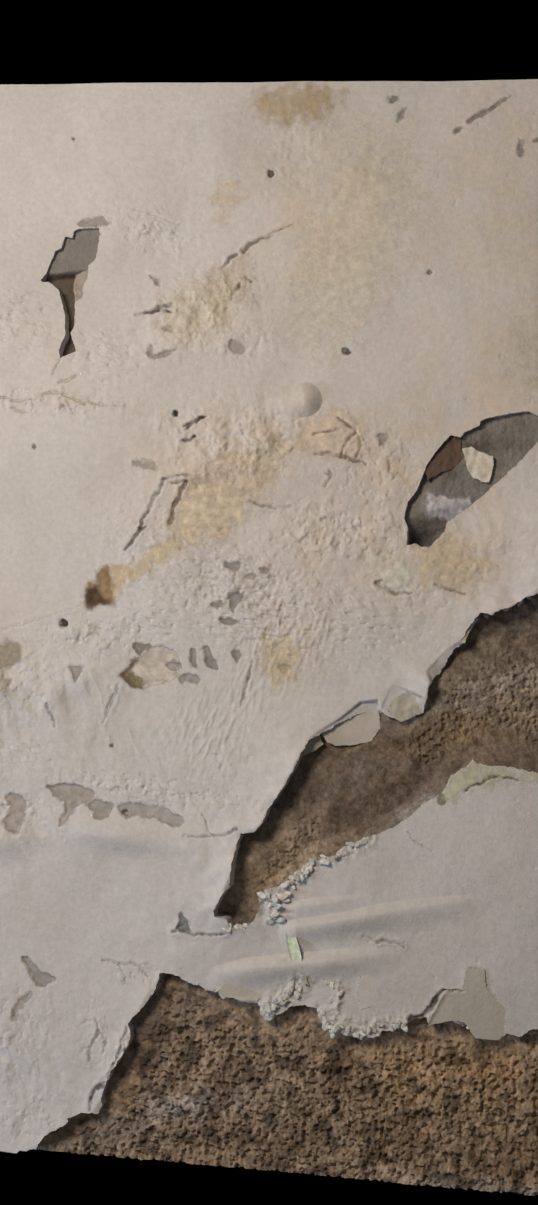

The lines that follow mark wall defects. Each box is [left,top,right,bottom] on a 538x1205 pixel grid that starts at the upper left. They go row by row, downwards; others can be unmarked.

flaking render [46,217,108,356]
damp [129,409,366,580]
flaking render [405,412,538,547]
peeling [224,562,268,579]
spalling [36,592,538,1196]